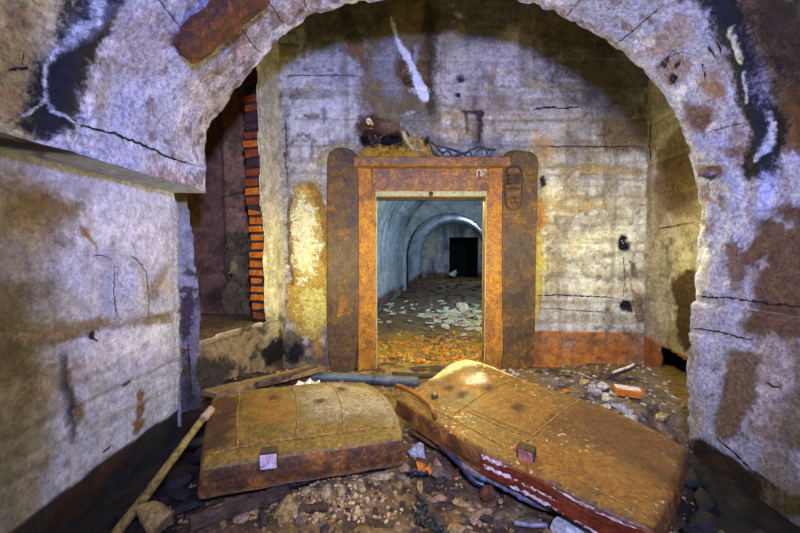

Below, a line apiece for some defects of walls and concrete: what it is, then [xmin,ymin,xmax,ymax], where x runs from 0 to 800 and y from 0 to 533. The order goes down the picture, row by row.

crack [597,4,664,75]
damp [0,0,127,155]
damp [691,0,800,181]
crack [57,111,200,167]
damp [670,270,696,351]
crack [690,327,752,340]
crack [697,295,800,308]
damp [61,355,77,442]
corrosion [133,390,145,432]